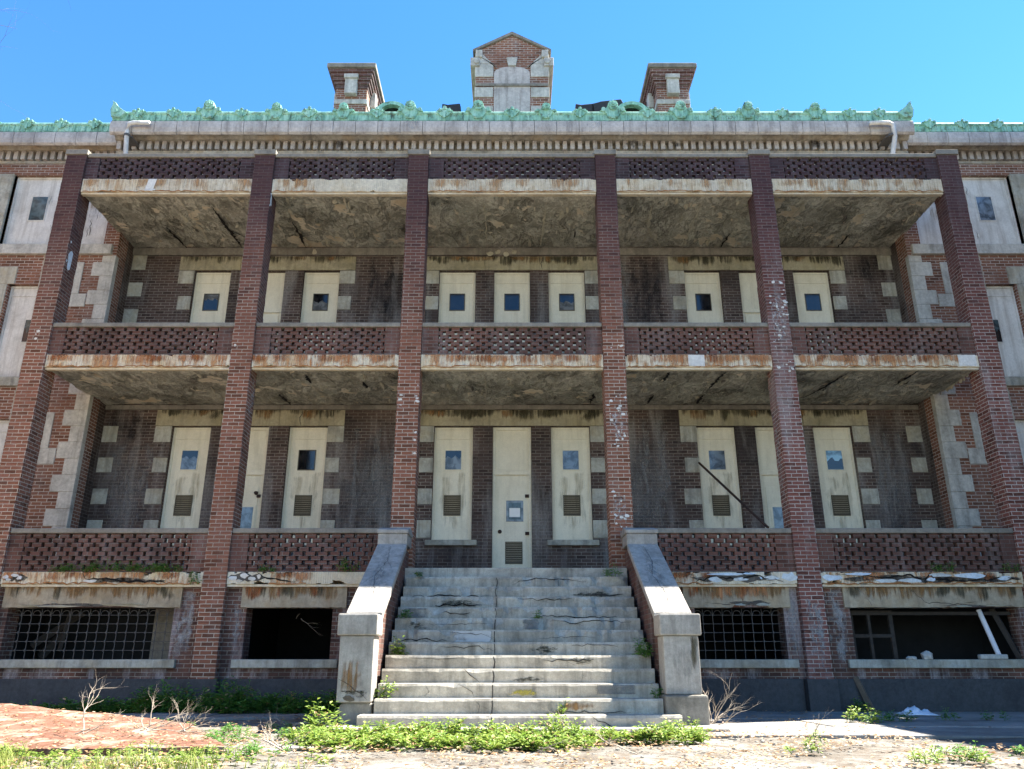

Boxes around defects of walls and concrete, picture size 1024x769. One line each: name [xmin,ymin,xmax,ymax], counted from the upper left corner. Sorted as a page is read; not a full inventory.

corrosion [436,179,592,192]
crack [212,207,244,246]
damp [429,256,594,264]
corrosion [48,355,227,368]
corrosion [425,355,602,368]
corrosion [797,354,958,367]
spalling [82,573,165,583]
spalling [228,572,291,582]
spalling [691,572,798,583]
spalling [822,573,1021,583]
crack [517,578,623,679]
crack [400,594,493,711]